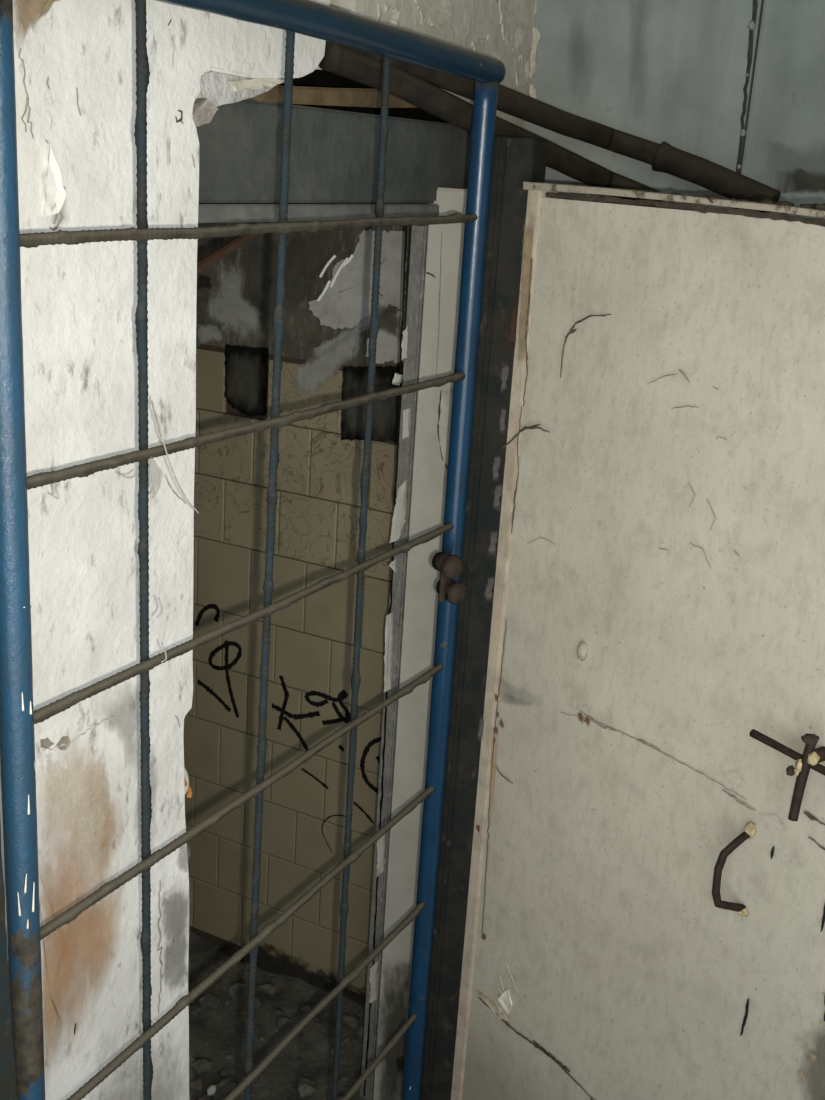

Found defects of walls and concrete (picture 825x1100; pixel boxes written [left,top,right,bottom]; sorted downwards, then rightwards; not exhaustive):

spalling [175,71,285,127]
leakage [785,169,825,192]
peeling [197,228,411,442]
peeling [389,480,407,543]
peeling [384,612,393,692]
peeling [377,834,385,876]
rust [44,856,113,1030]
peeling [369,960,379,1003]
crack [476,991,594,1100]